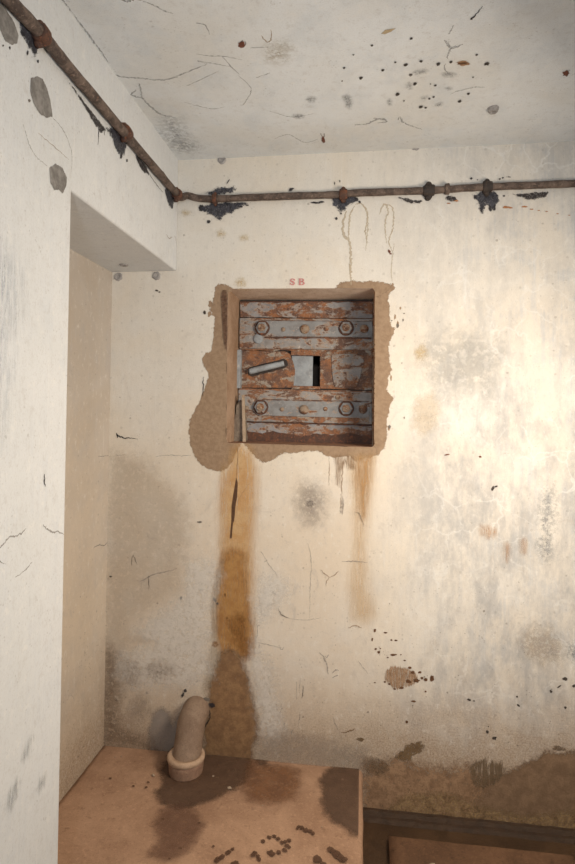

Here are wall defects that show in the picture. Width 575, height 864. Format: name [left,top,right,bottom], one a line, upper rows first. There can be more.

crack [230,451,247,538]
rust [204,431,372,759]
water stain [149,709,253,857]
water stain [320,746,575,835]